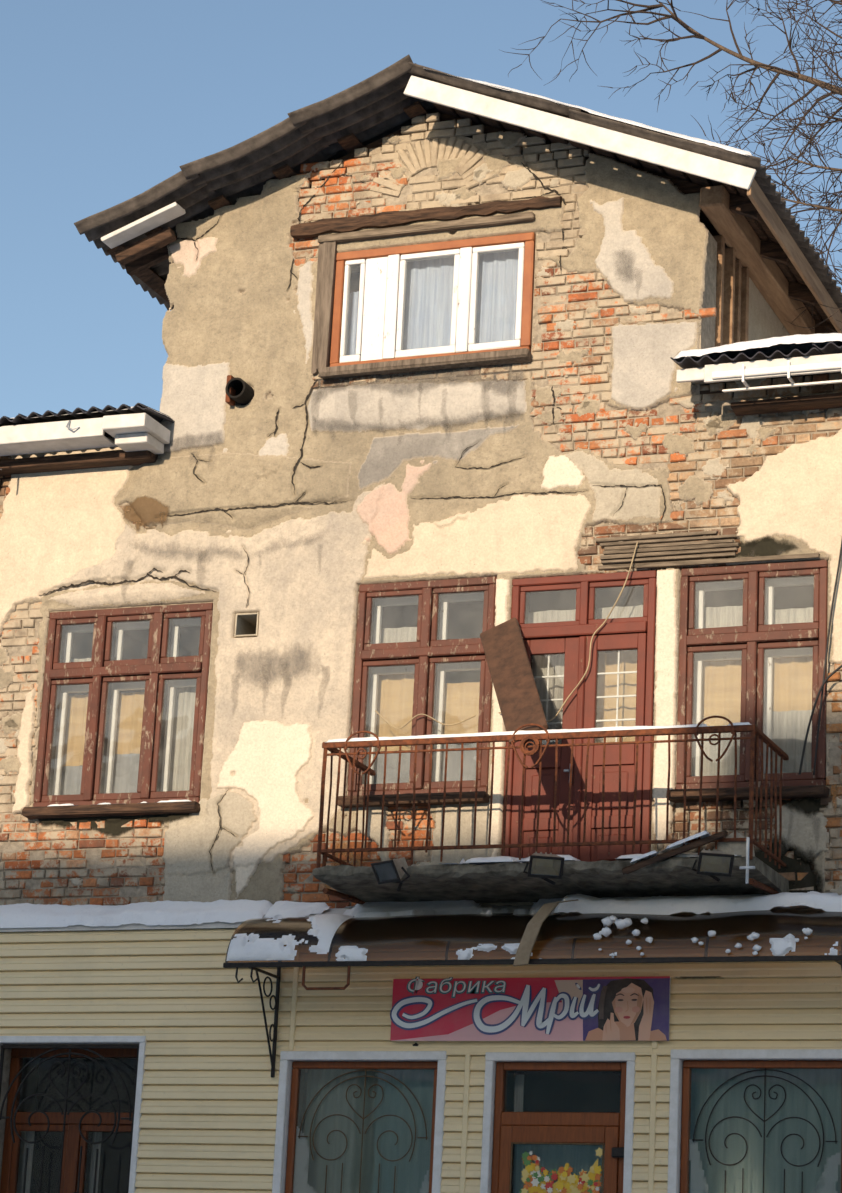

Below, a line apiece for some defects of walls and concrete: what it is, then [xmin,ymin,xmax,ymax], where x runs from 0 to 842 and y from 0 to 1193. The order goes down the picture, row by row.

crack [551,386,562,425]
crack [155,379,349,519]
peeling [0,112,842,909]
crack [412,444,666,523]
crack [39,568,217,596]
crack [209,790,236,871]